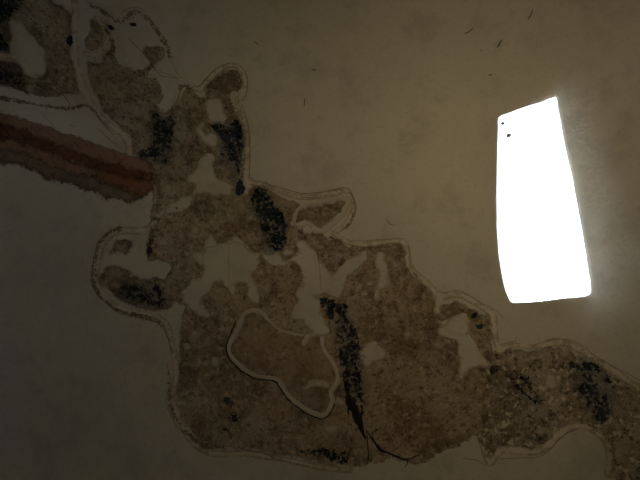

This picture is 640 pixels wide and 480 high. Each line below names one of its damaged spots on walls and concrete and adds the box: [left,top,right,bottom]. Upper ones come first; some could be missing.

damp [139,113,175,165]
spalling [0,0,356,340]
damp [211,119,288,251]
damp [92,249,164,328]
crack [213,320,420,467]
damp [319,297,366,423]
spalling [146,195,640,480]
damp [568,361,614,428]